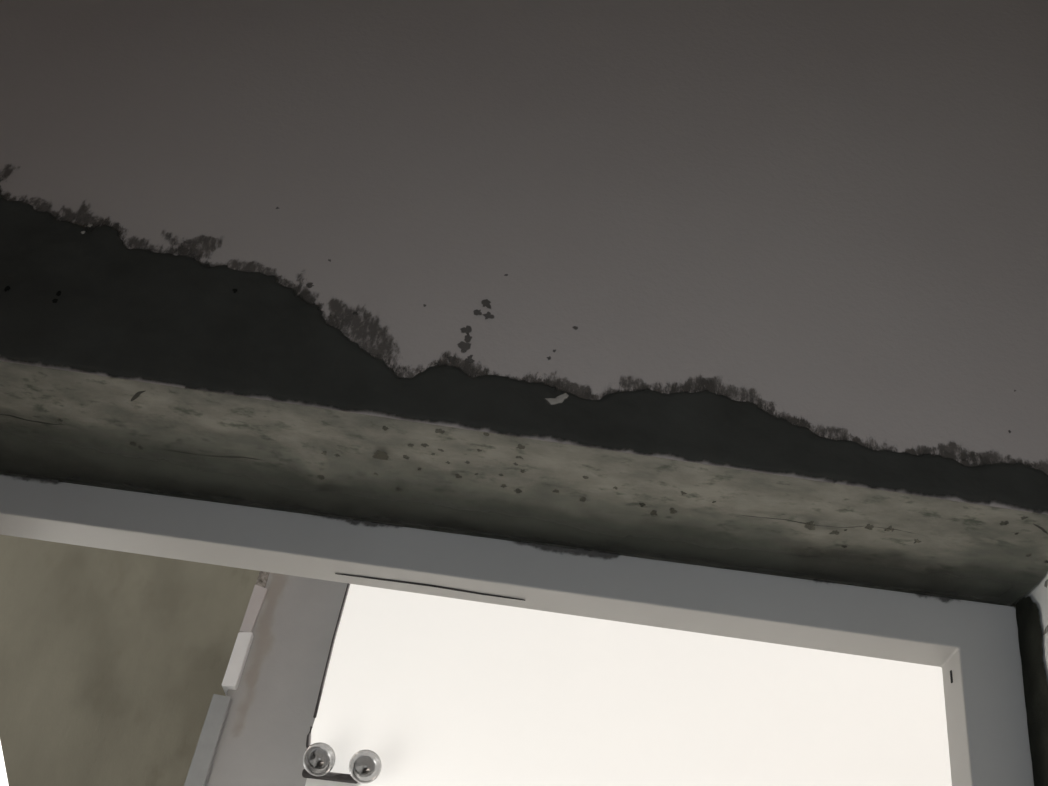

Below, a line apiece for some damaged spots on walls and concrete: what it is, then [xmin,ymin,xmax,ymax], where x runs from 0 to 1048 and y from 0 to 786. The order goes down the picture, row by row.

peeling [545,393,569,405]